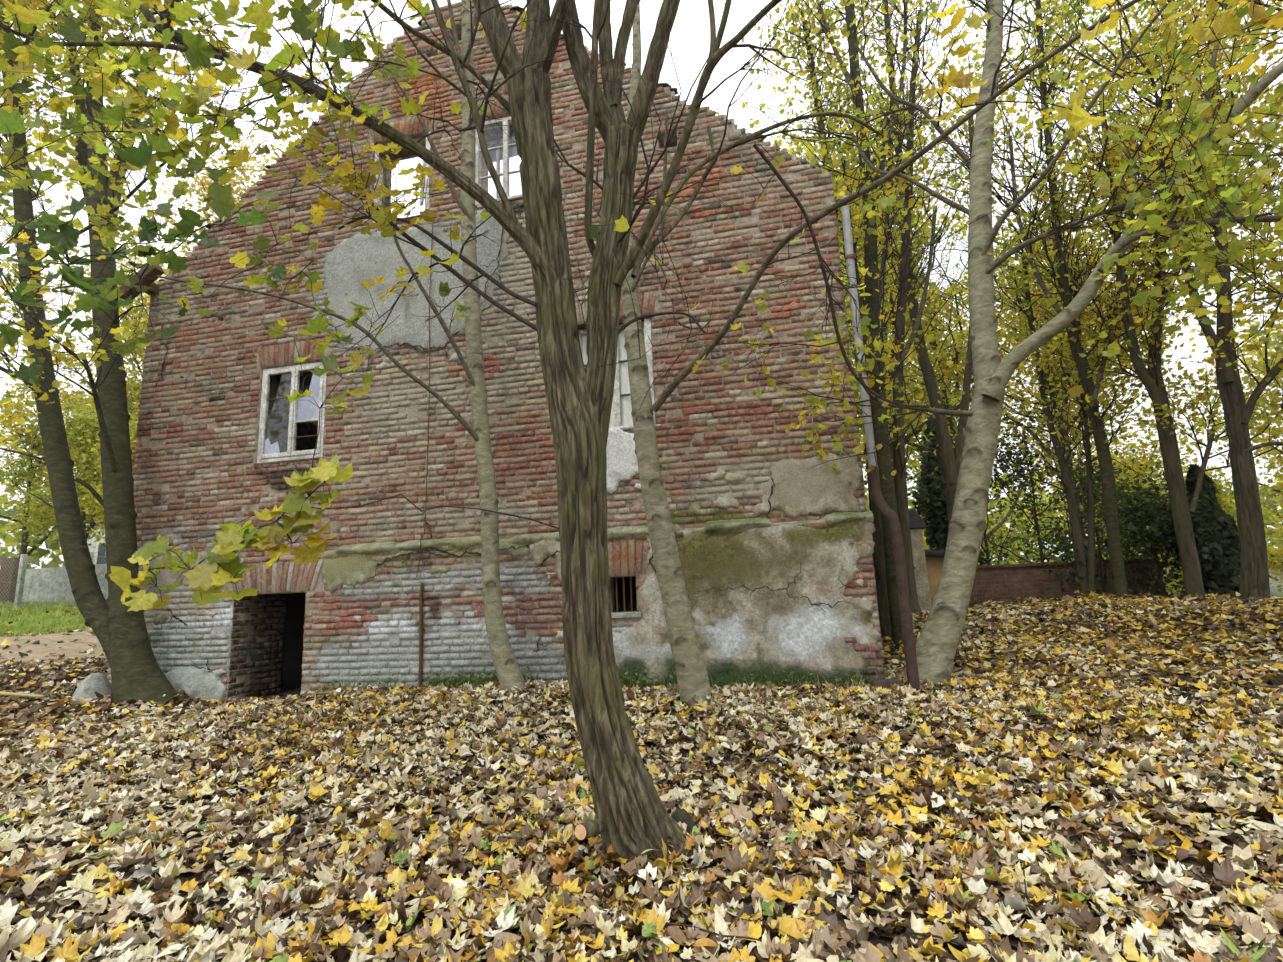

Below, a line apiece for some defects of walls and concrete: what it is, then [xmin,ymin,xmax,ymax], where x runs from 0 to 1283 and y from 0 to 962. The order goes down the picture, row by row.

flaking render [335,208,509,317]
flaking render [338,321,469,387]
flaking render [499,533,563,639]
flaking render [612,535,673,686]
crack [697,563,862,612]
flaking render [689,453,881,679]